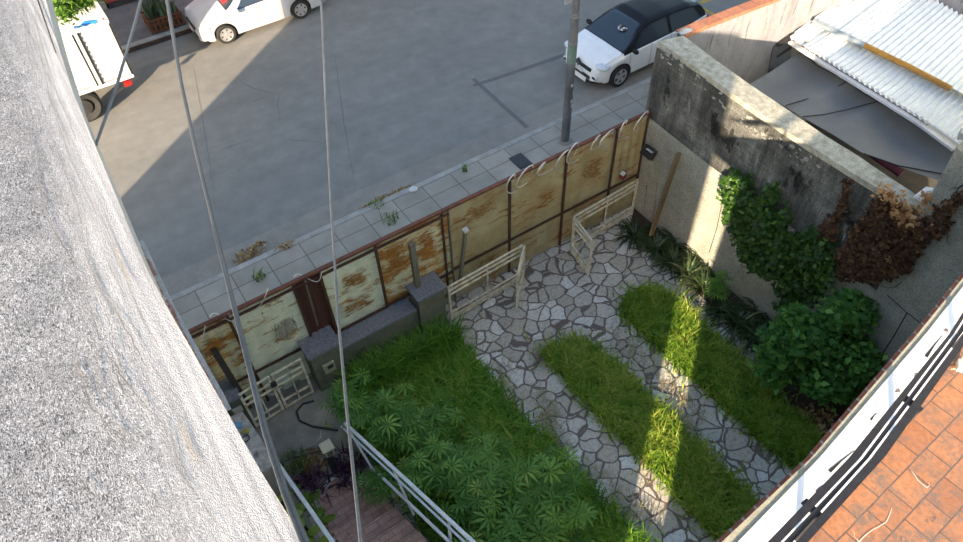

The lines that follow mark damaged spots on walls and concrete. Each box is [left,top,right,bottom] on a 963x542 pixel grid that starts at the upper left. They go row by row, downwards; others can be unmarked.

corrosion [417,227,438,265]
corrosion [339,268,378,317]
crack [89,303,145,398]
crack [73,365,127,448]